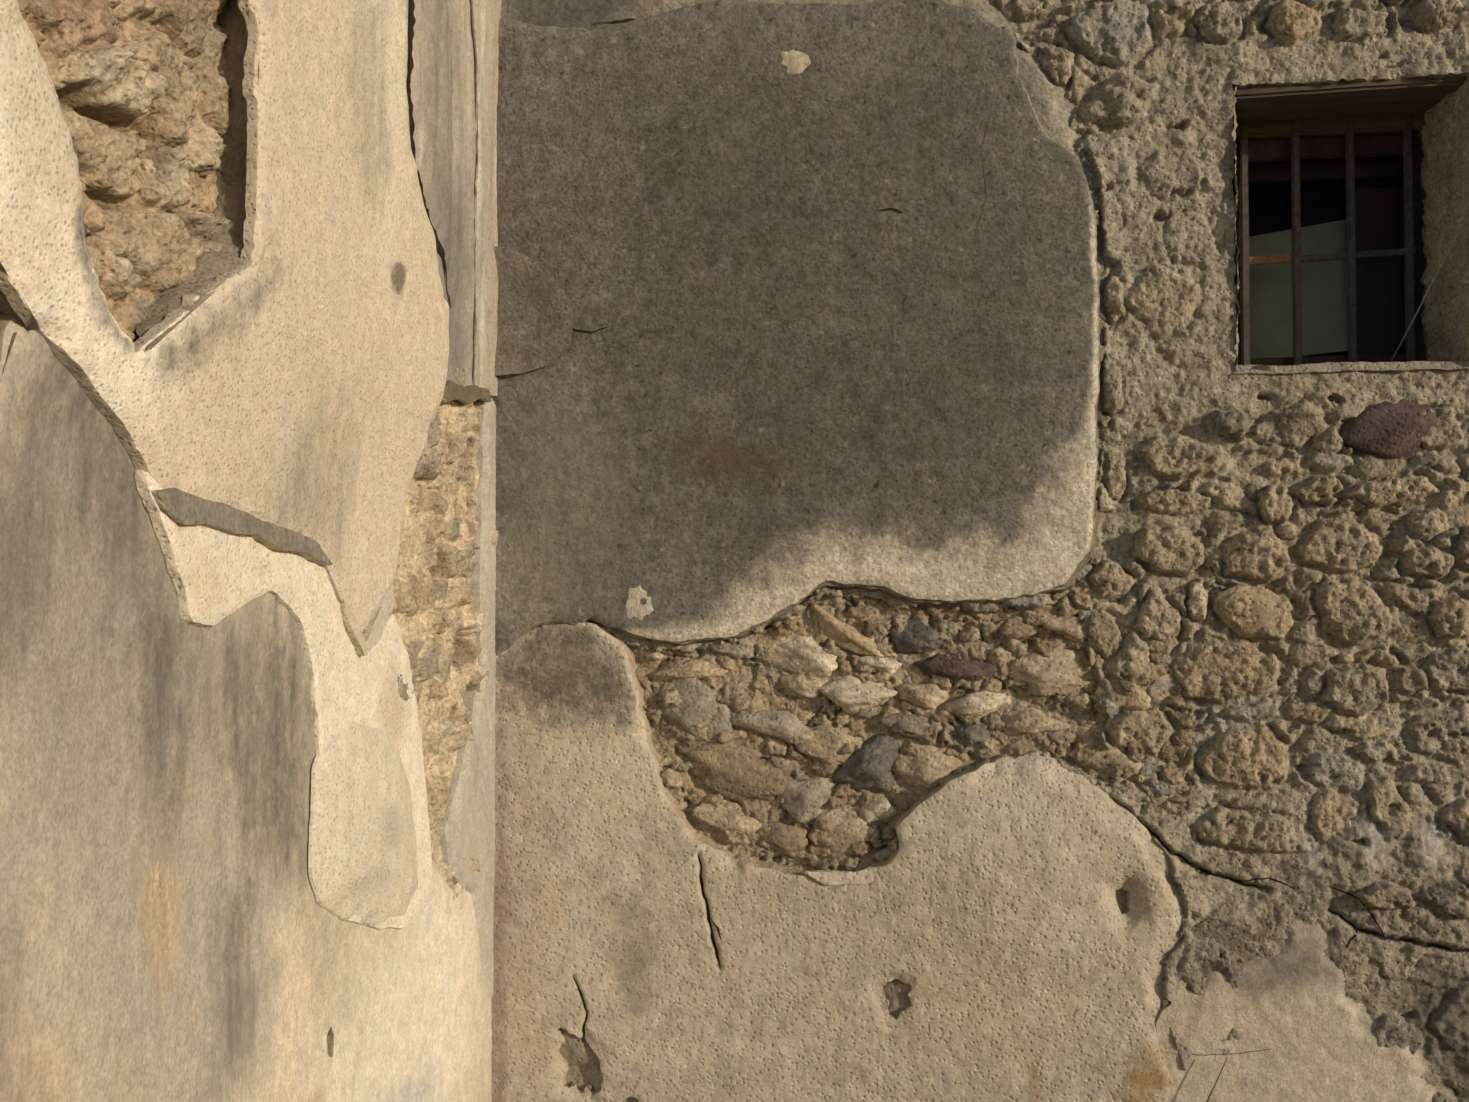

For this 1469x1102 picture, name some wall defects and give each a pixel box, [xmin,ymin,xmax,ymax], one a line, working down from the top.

spalling [17,0,259,350]
spalling [0,263,40,382]
water stain [225,649,297,861]
spalling [629,581,1195,885]
crack [698,855,722,966]
crack [1144,825,1296,890]
crack [1329,887,1469,952]
crack [573,977,588,1042]
spalling [557,1028,639,1102]
spalling [883,979,911,1018]